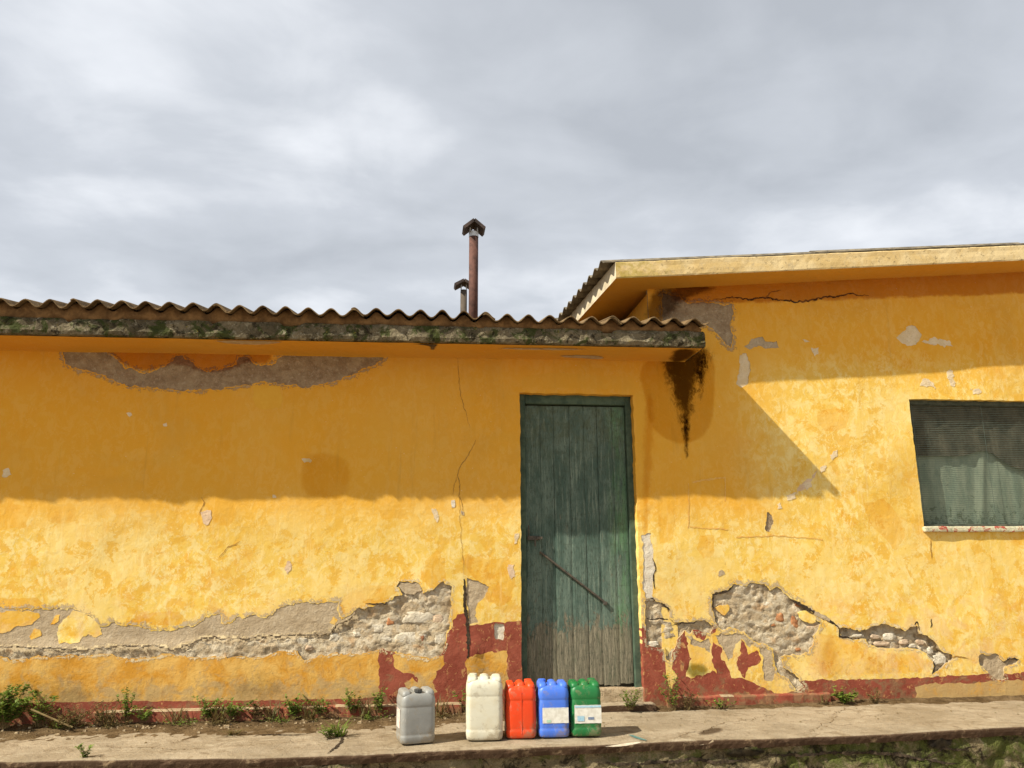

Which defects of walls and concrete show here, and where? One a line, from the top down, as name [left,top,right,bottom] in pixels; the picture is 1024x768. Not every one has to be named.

peeling [59,340,388,395]
water stain [665,350,706,456]
peeling [657,289,779,388]
crack [720,290,869,303]
peeling [897,325,952,347]
crack [451,358,476,658]
spalling [0,578,489,663]
spalling [494,623,505,640]
spalling [640,533,1020,693]